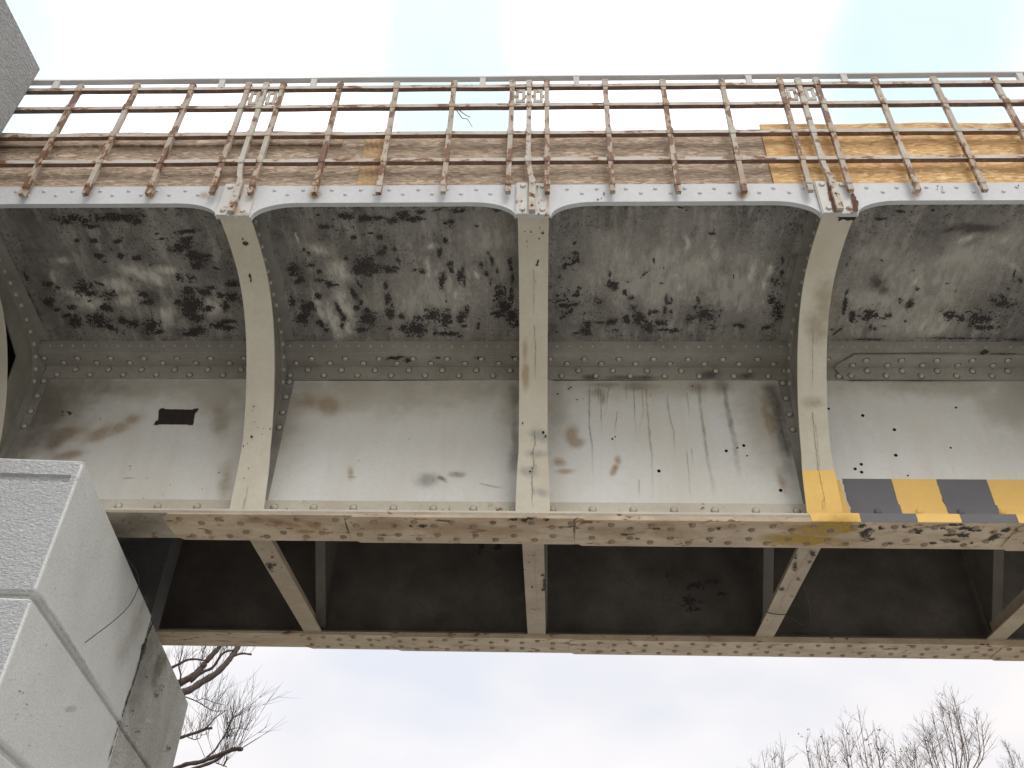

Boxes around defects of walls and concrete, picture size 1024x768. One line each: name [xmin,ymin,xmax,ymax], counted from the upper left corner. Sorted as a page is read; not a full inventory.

water stain [49,257,177,311]
water stain [154,302,176,332]
water stain [203,298,223,316]
water stain [294,233,360,339]
water stain [376,242,488,324]
water stain [458,214,515,282]
water stain [581,227,774,314]
water stain [830,233,1024,339]
peeling [154,408,198,425]
peeling [858,524,885,541]
peeling [902,524,1011,545]